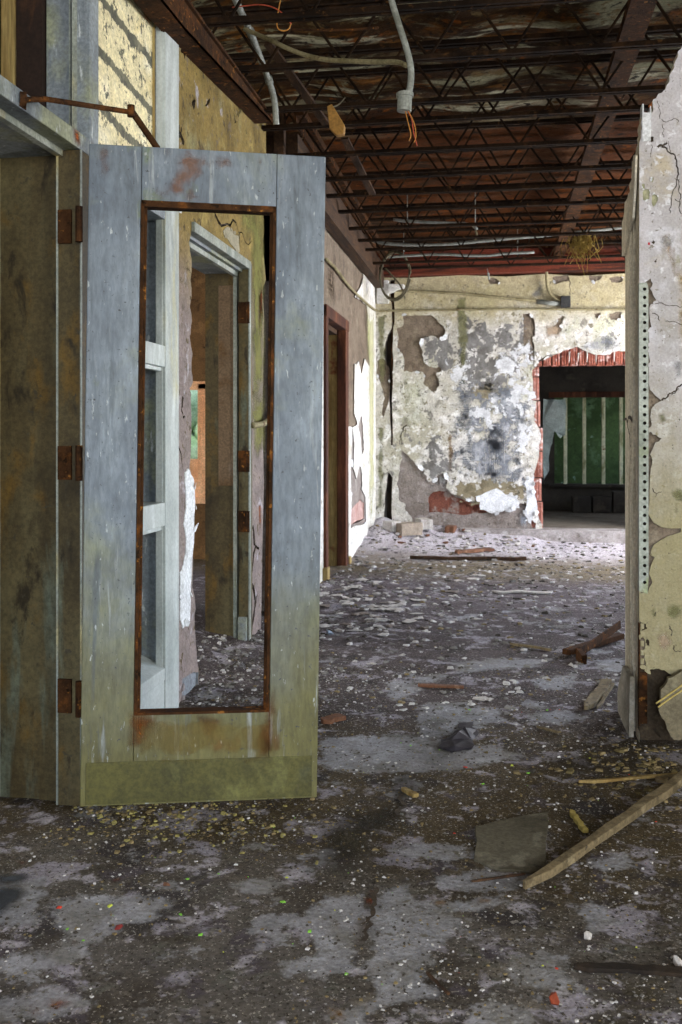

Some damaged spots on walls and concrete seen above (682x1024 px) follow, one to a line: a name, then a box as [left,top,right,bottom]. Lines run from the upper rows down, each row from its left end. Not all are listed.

crack [650,101,682,214]
peeling [179,469,199,628]
flaking render [324,227,390,528]
peeling [396,313,537,457]
flaking render [397,434,539,529]
water stain [450,298,532,500]
flaking render [641,279,681,593]
flaking render [638,622,682,741]